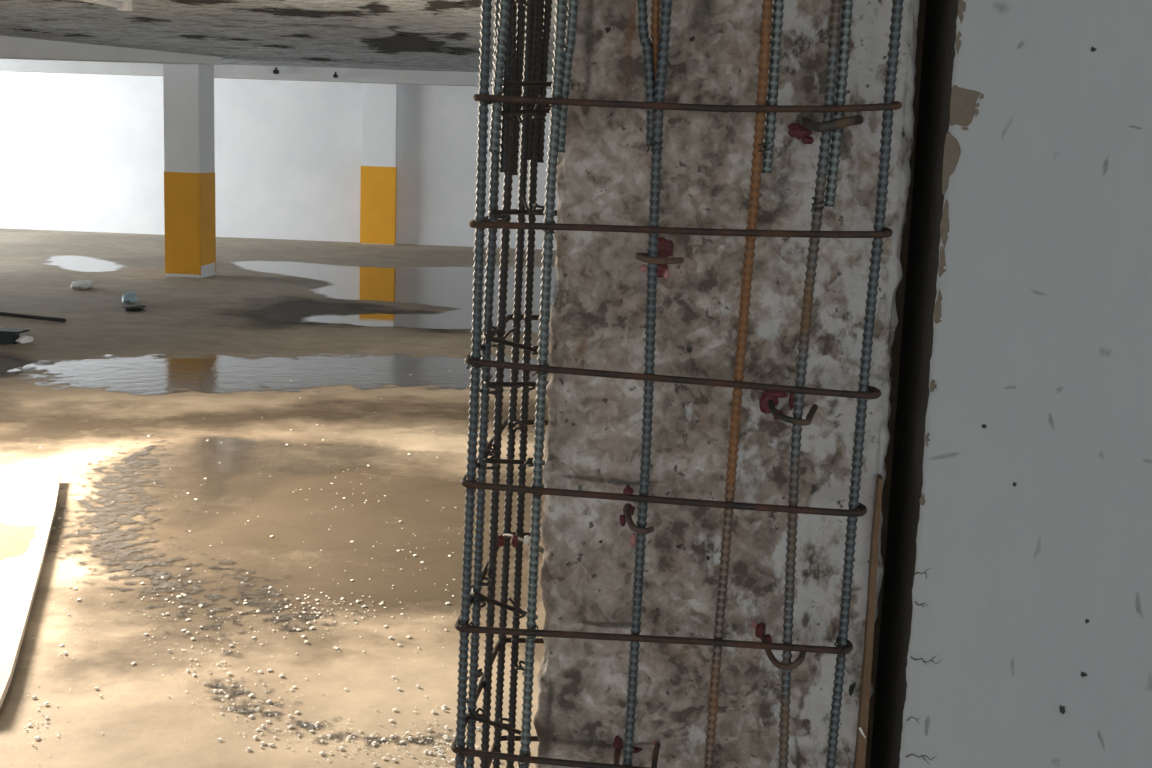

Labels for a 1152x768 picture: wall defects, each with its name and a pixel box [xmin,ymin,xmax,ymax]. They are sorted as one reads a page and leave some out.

flaking render [934,85,984,323]
damp [567,475,639,485]